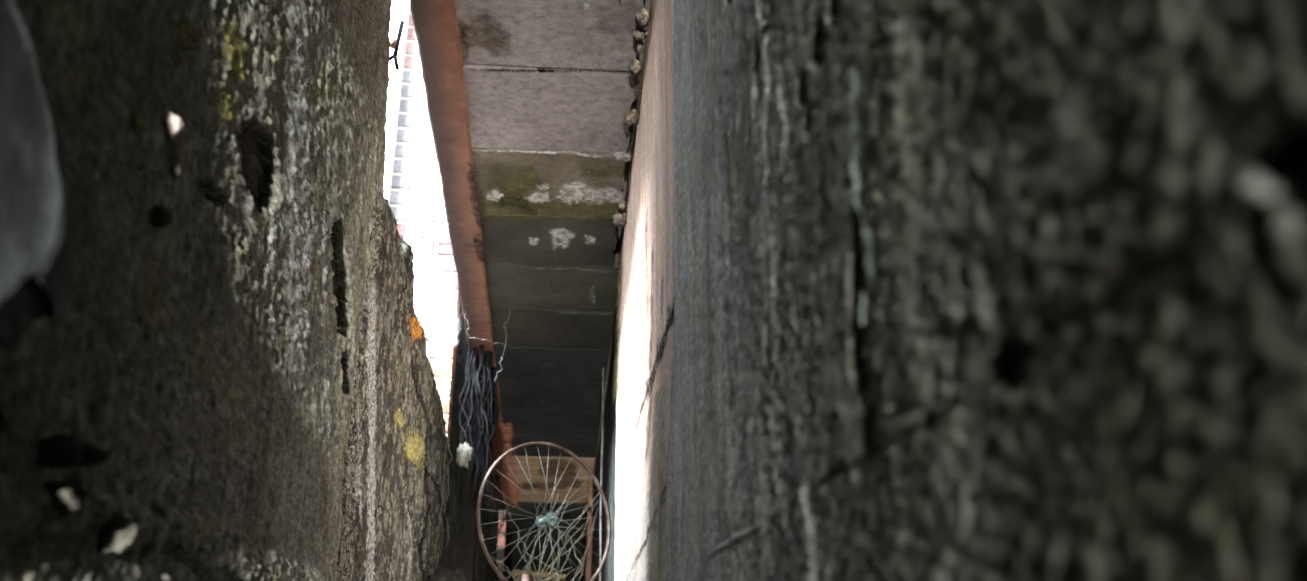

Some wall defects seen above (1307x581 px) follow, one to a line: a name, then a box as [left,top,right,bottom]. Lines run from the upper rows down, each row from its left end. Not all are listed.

water stain [458,14,507,59]
spalling [217,88,274,210]
corrosion [468,163,486,261]
water stain [481,150,631,209]